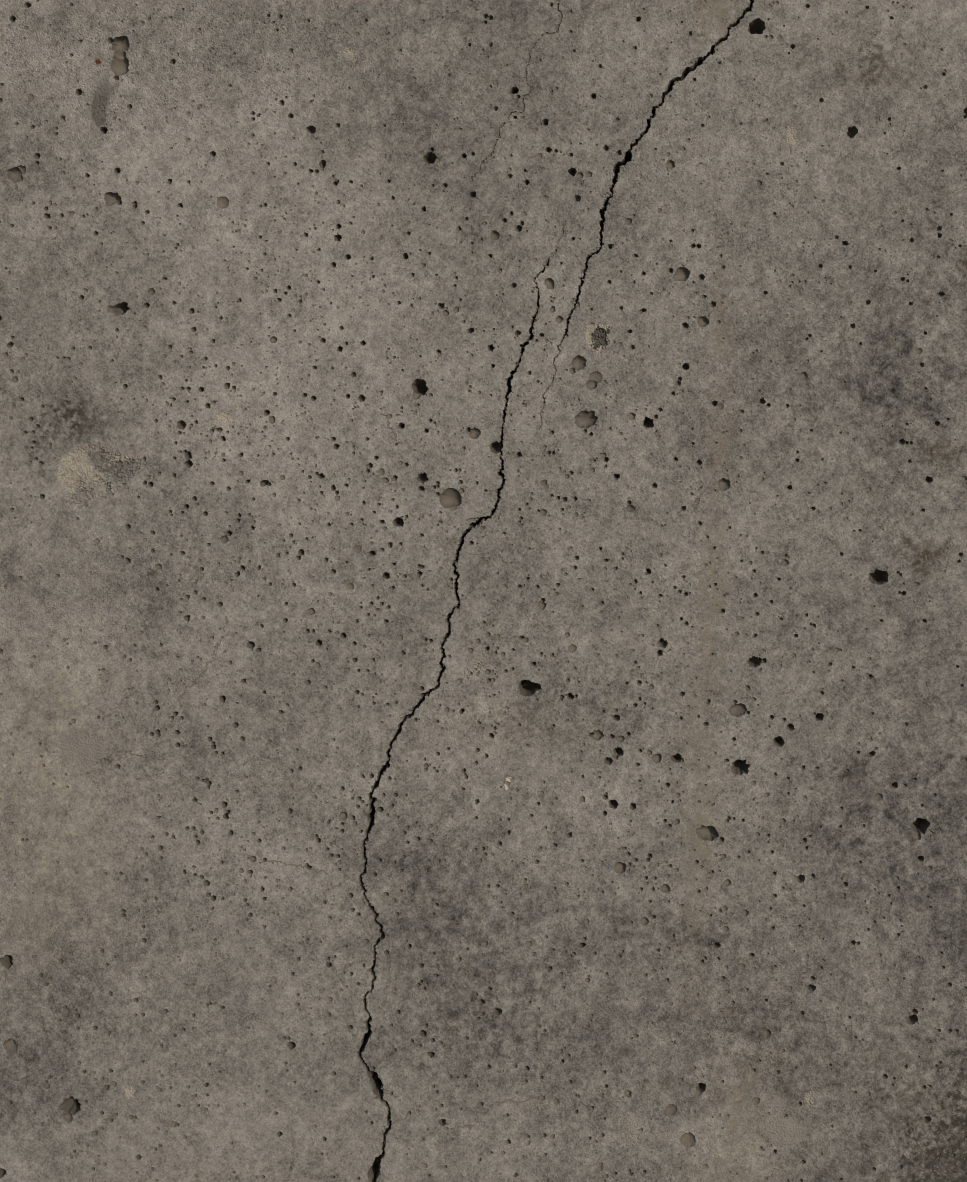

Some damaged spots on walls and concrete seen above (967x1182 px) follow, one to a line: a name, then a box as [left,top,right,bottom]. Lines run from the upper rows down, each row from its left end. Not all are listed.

crack [266,860,327,875]
crack [357,0,754,1182]